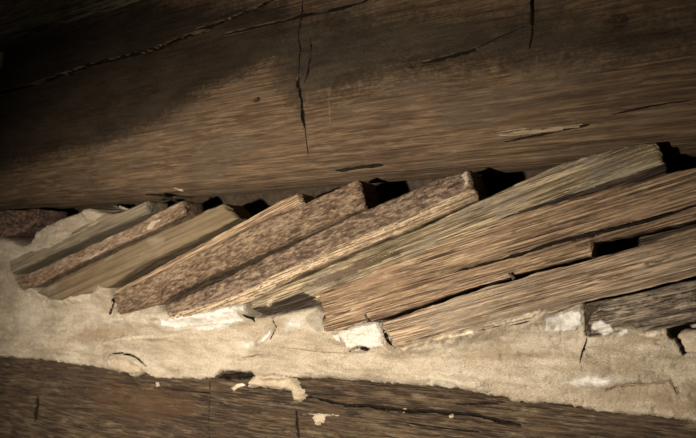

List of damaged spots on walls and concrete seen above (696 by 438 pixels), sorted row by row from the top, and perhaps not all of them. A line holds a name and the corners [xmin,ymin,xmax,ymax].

crack [422,0,535,64]
crack [0,0,367,152]
crack [612,99,695,115]
crack [112,352,147,367]